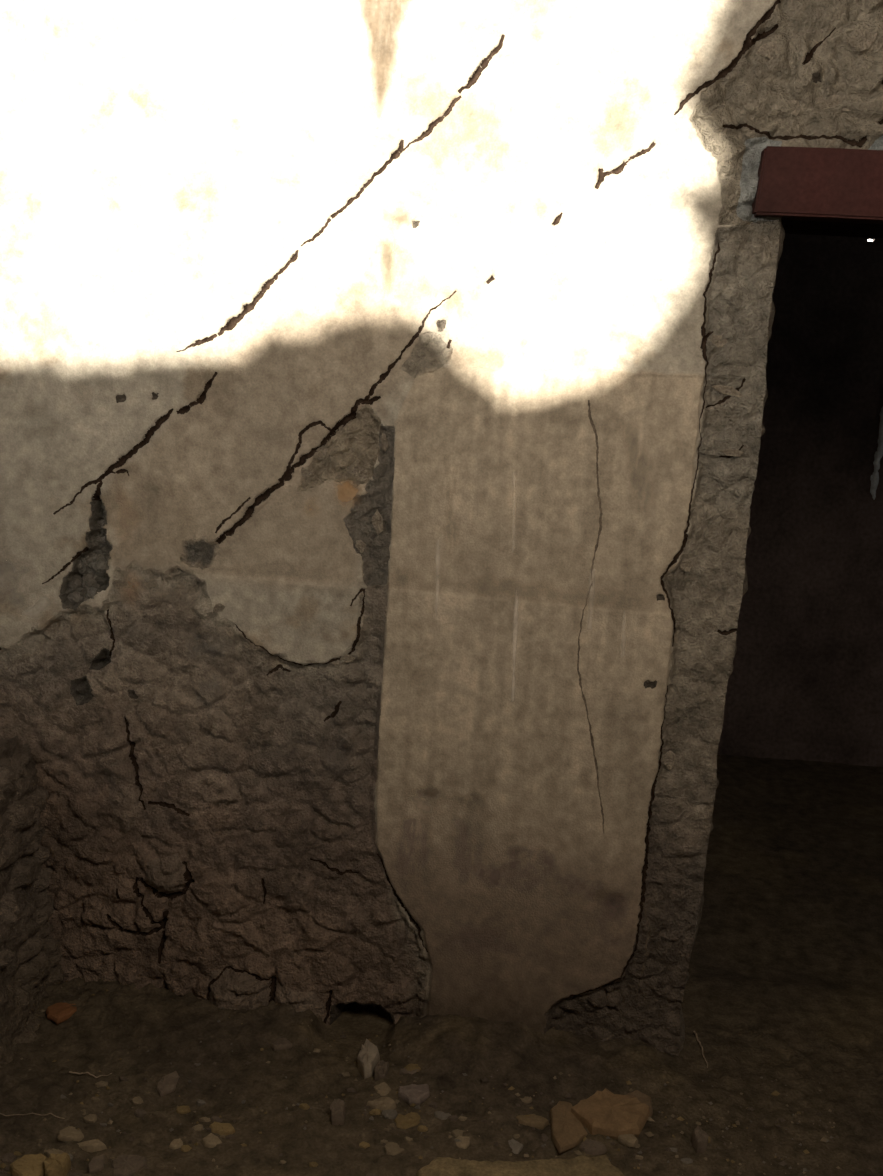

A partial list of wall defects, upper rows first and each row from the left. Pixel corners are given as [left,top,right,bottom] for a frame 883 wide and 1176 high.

crack [674,0,781,115]
crack [176,34,505,352]
crack [552,212,563,226]
crack [595,142,656,189]
crack [53,372,218,515]
crack [215,290,457,544]
crack [42,547,89,584]
crack [577,400,604,833]
flaking render [544,0,883,1056]
crack [124,716,190,816]
flaking render [0,404,430,1025]
crack [107,861,195,964]